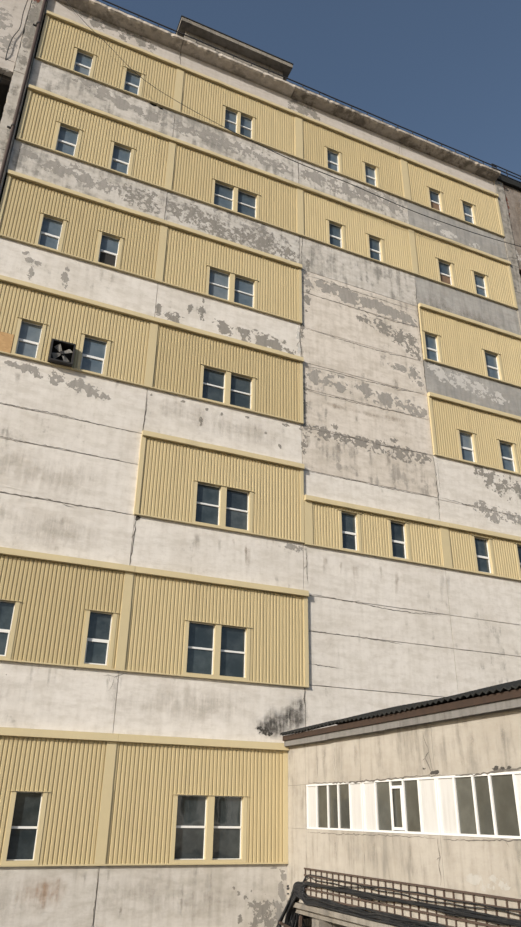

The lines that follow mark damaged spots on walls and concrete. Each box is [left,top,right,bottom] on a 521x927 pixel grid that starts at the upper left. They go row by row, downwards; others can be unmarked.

peeling [0,0,40,70]
peeling [72,77,404,213]
peeling [4,147,510,405]
peeling [282,369,432,464]
peeling [473,465,521,525]
damp [260,701,302,732]
peeling [233,866,286,927]